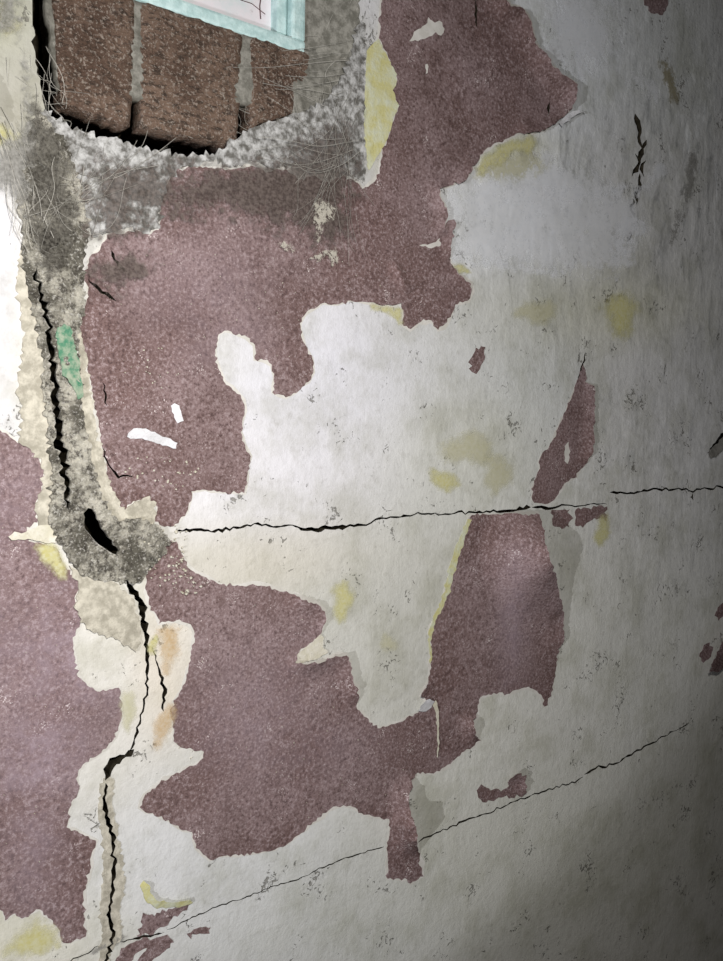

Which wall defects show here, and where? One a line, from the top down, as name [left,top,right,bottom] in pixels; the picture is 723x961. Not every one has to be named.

crack [33,229,118,555]
peeling [0,0,586,944]
crack [177,485,723,533]
peeling [530,365,596,505]
peeling [708,433,723,459]
peeling [709,642,723,672]
crack [71,580,383,961]
crack [419,723,689,842]